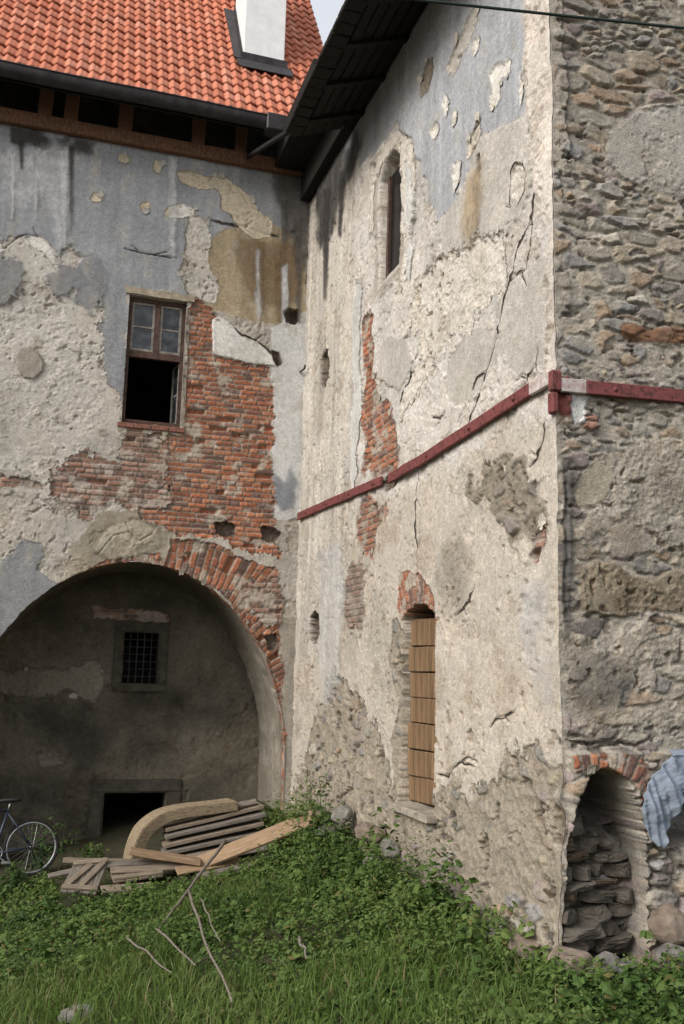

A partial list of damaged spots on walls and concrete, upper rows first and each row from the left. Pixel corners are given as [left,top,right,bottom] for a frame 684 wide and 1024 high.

flaking render [417,3,481,98]
leakage [1,127,93,246]
flaking render [177,170,273,239]
leakage [463,170,481,236]
flaking render [452,0,557,372]
flaking render [360,128,513,478]
crack [432,162,535,422]
rust [558,392,572,415]
flaking render [0,203,287,745]
crack [413,473,421,567]
flaking render [529,522,548,563]
crack [438,756,477,778]